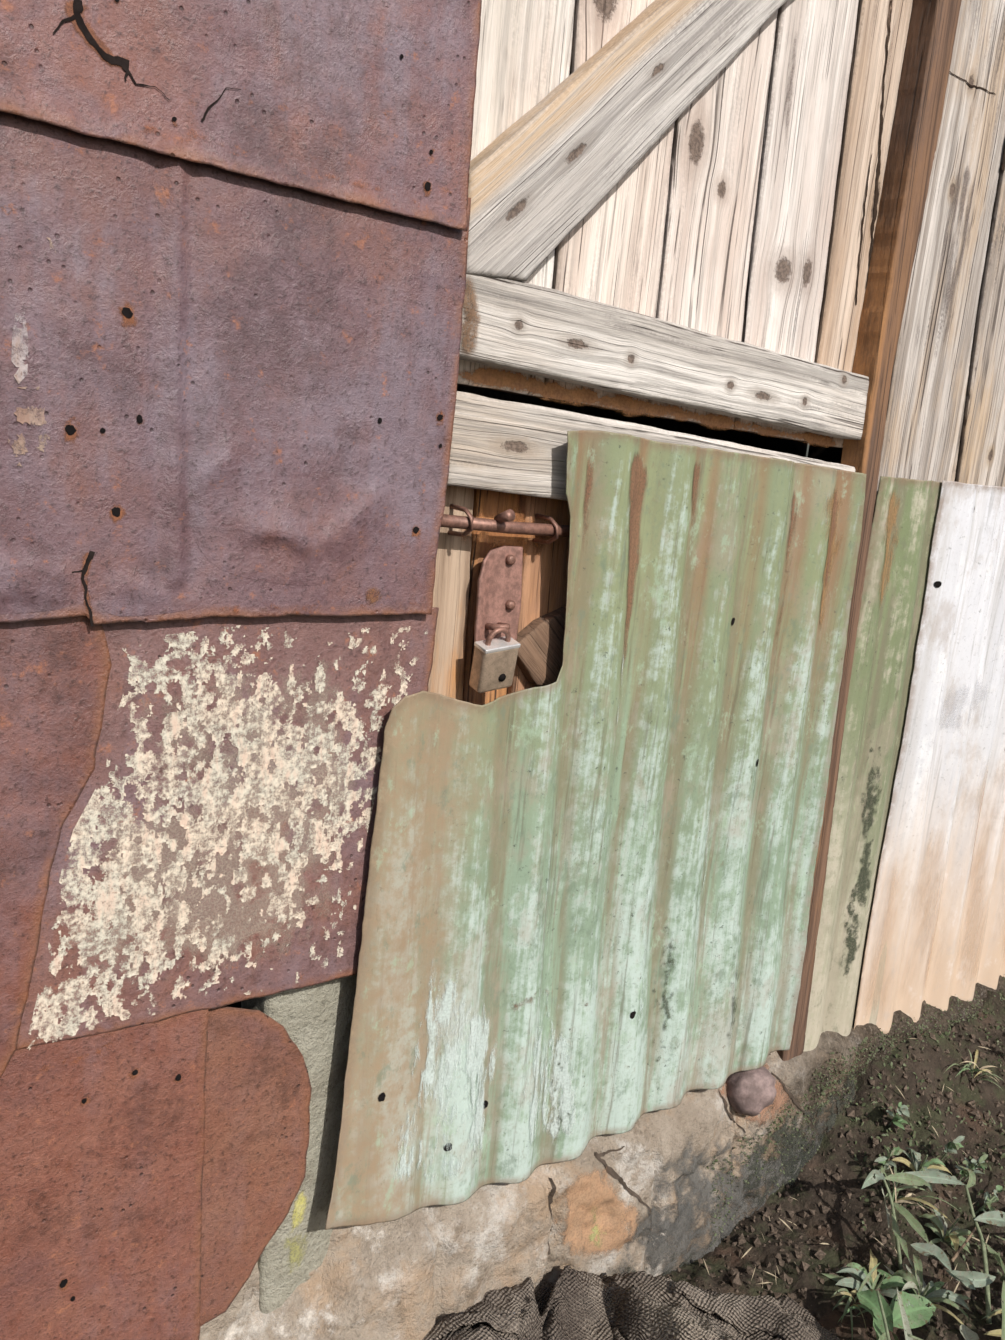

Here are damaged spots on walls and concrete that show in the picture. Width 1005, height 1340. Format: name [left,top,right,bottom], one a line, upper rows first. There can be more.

crack [53,0,169,100]
crack [201,88,241,122]
crack [81,551,95,627]
rust [473,512,546,552]
rust [624,454,647,658]
rust [692,463,700,522]
rust [786,494,797,560]
rust [820,491,839,624]
rust [0,0,482,1340]
peeling [27,625,428,1050]
water stain [841,747,882,974]
crack [595,1146,652,1231]